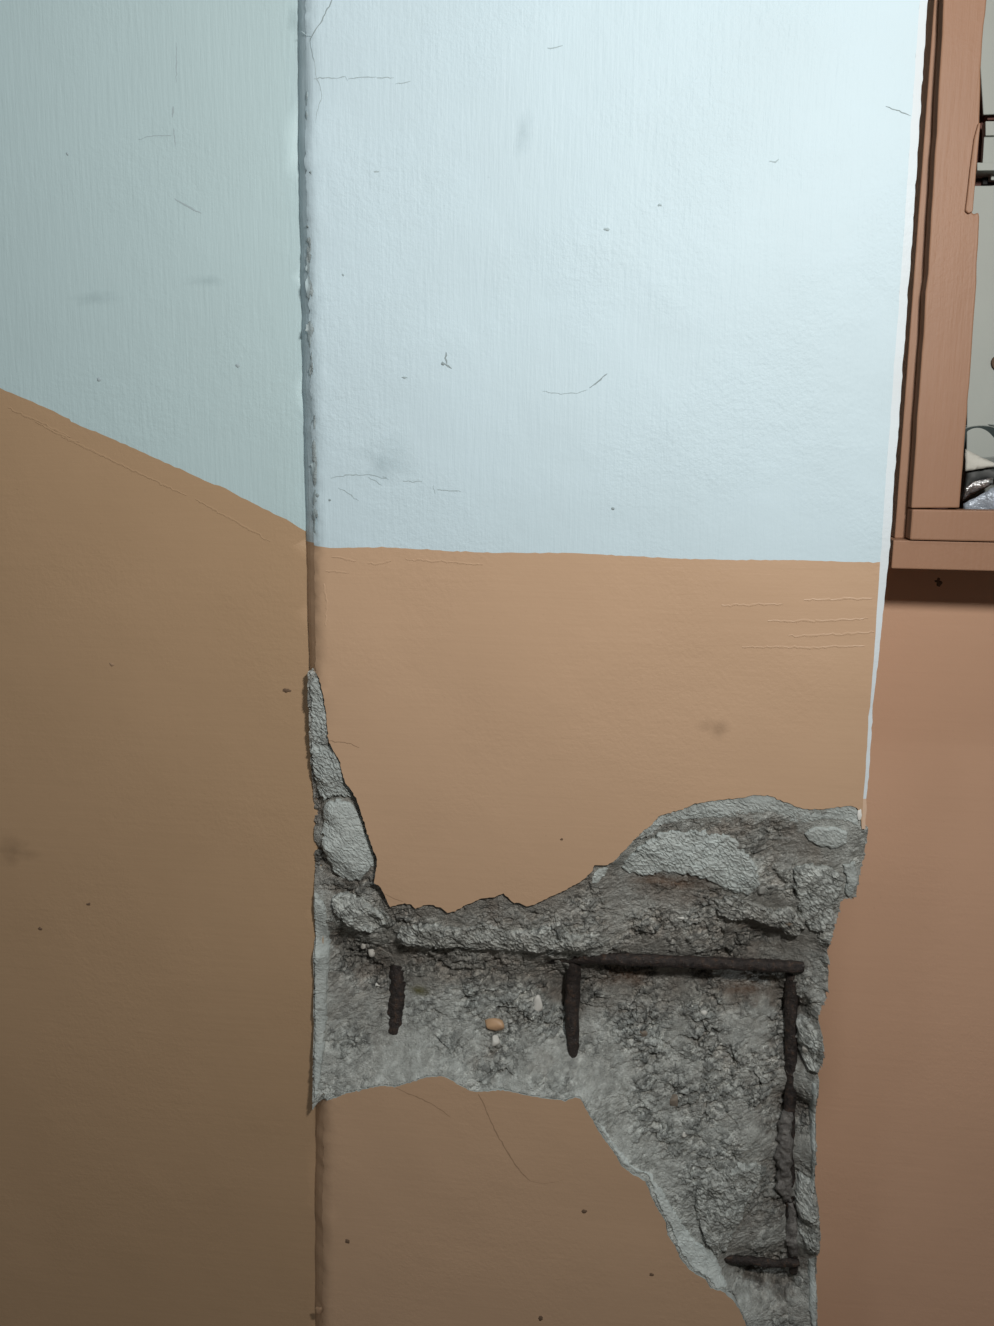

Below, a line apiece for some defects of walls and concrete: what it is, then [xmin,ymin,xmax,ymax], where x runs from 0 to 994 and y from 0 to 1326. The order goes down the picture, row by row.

spalling [307,667,868,1326]